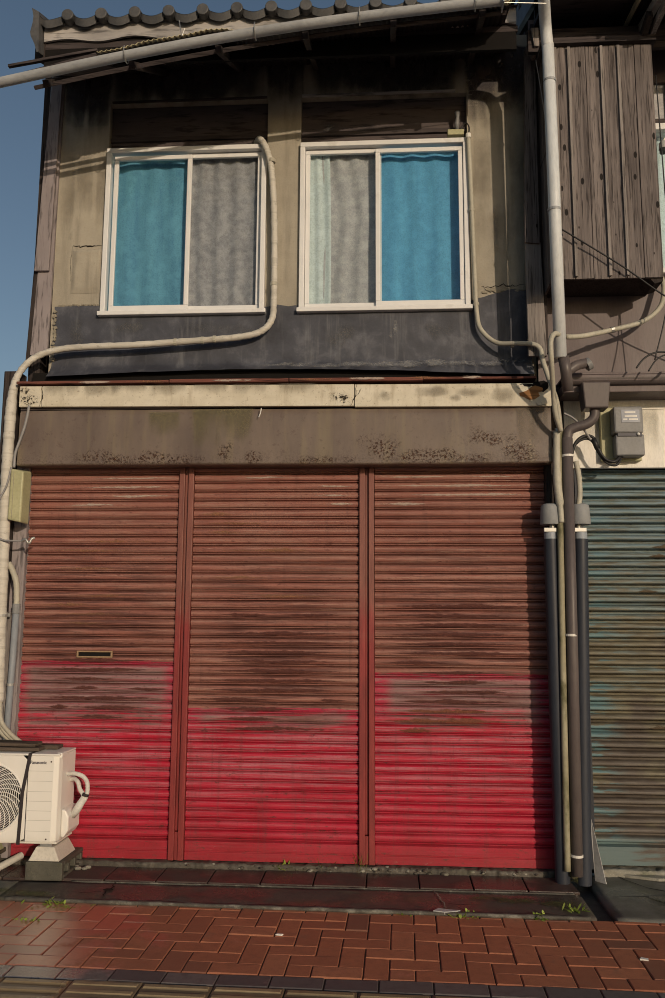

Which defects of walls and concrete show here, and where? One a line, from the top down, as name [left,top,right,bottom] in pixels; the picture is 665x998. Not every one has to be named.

spalling [516,380,549,406]
rust [362,430,537,464]